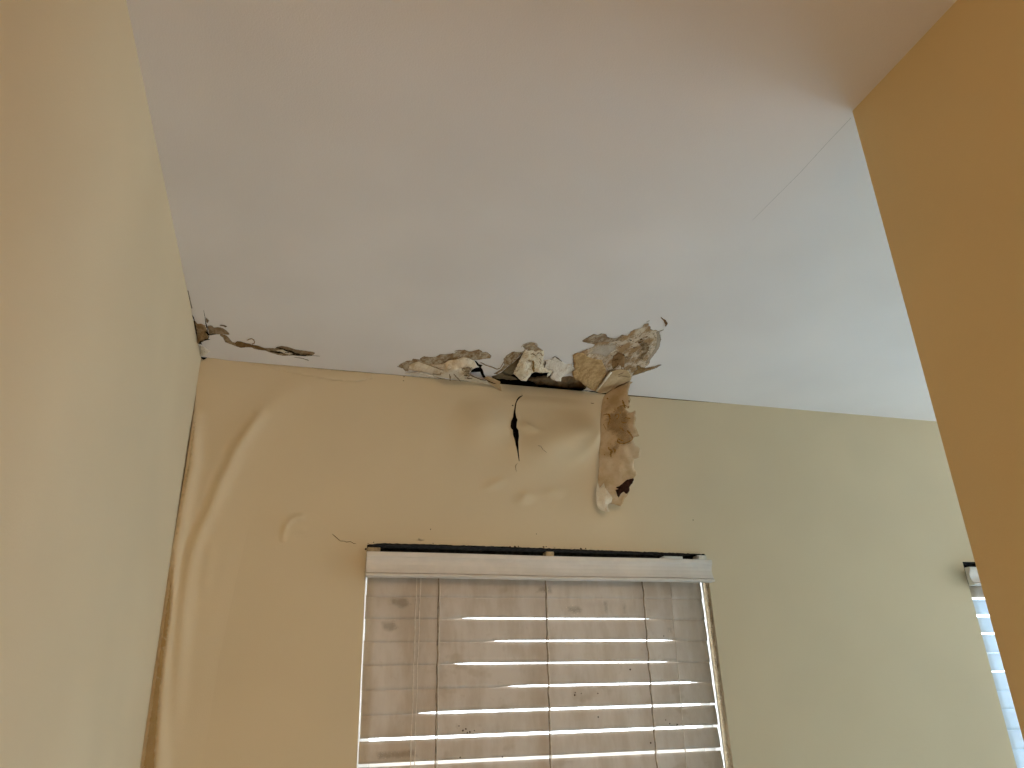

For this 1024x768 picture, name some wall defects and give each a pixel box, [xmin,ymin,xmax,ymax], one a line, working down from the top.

peeling [471,321,662,393]
crack [508,396,547,472]